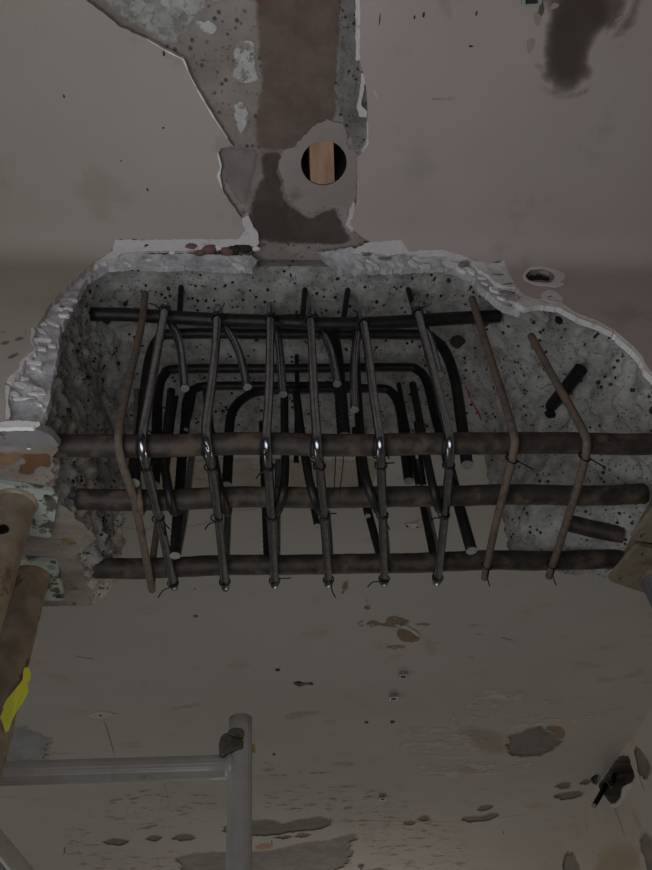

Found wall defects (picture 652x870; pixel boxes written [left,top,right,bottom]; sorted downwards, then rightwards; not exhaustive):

leakage [534,0,630,87]
spalling [0,0,652,434]
spalling [128,457,187,489]
spalling [222,455,233,487]
spalling [401,455,427,486]
spalling [169,510,184,559]
spalling [363,508,379,553]
spalling [406,507,436,552]
spalling [454,506,477,555]
spalling [503,726,565,758]
spalling [174,851,226,870]
spalling [252,816,359,870]